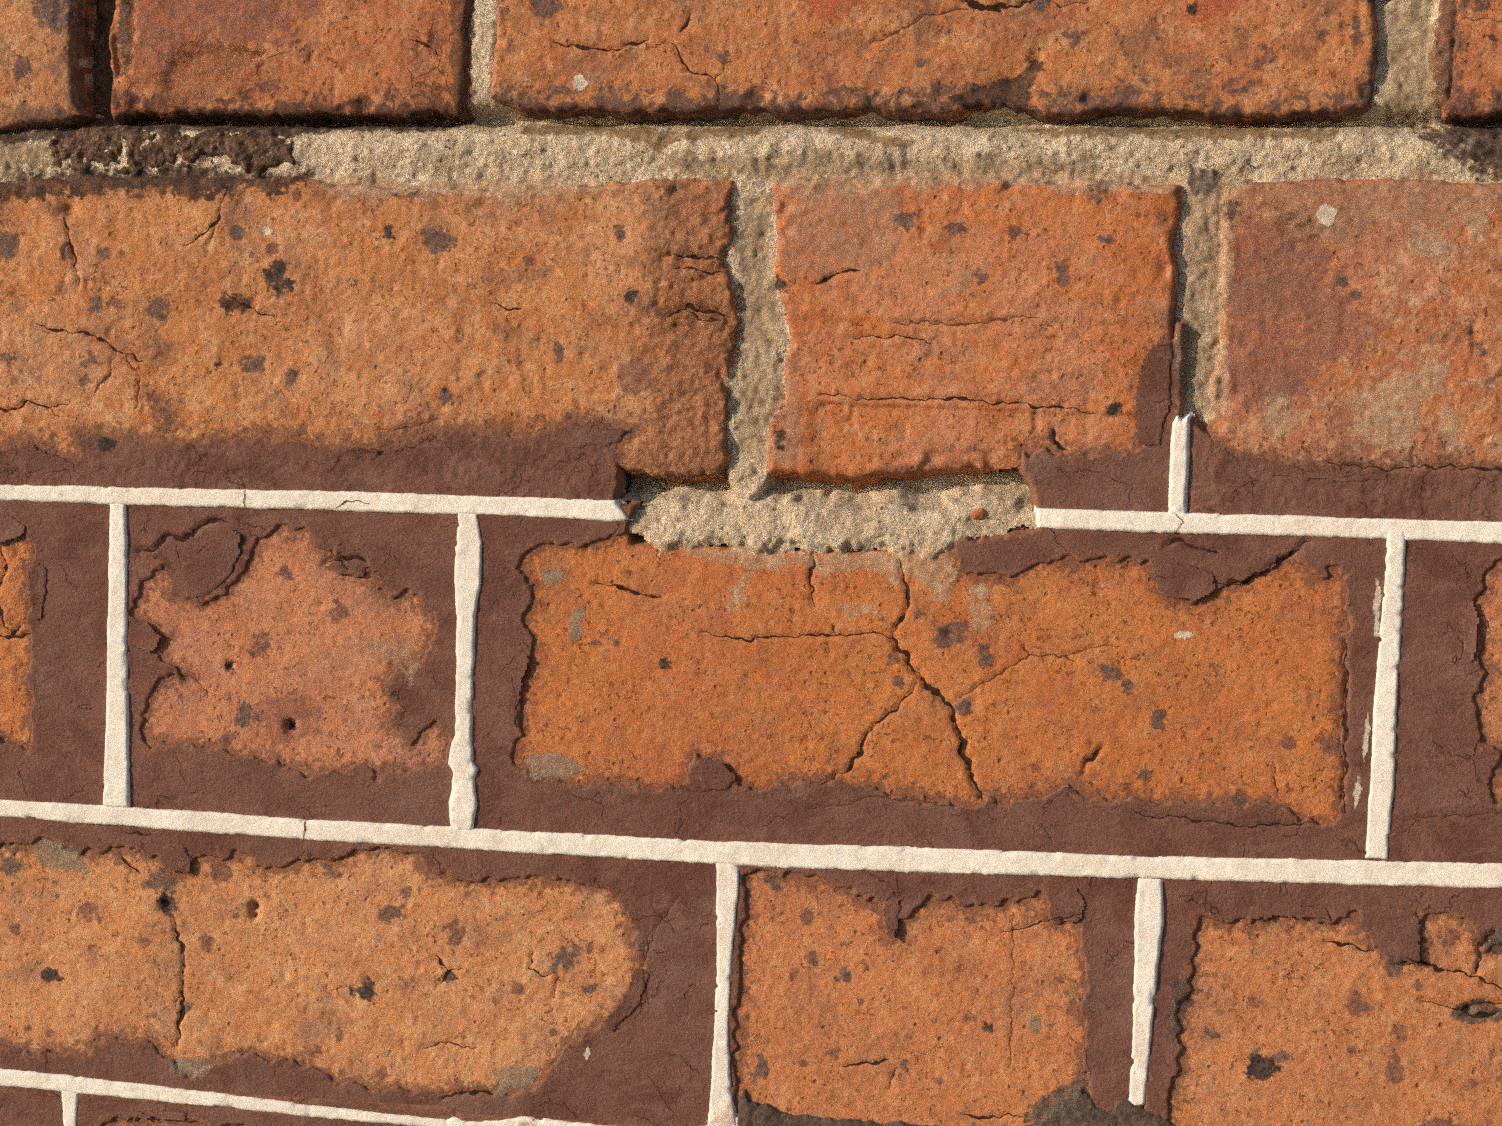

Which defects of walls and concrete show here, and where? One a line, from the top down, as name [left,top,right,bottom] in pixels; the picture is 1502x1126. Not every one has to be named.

crack [869,0,1088,44]
crack [63,217,80,285]
crack [0,323,143,417]
peeling [0,514,46,750]
peeling [128,525,449,781]
crack [702,555,1117,809]
peeling [506,525,1350,824]
crack [173,917,185,1046]
peeling [0,838,648,1096]
peeling [732,870,1090,1126]
peeling [1168,903,1502,1126]
crack [1326,930,1502,1018]